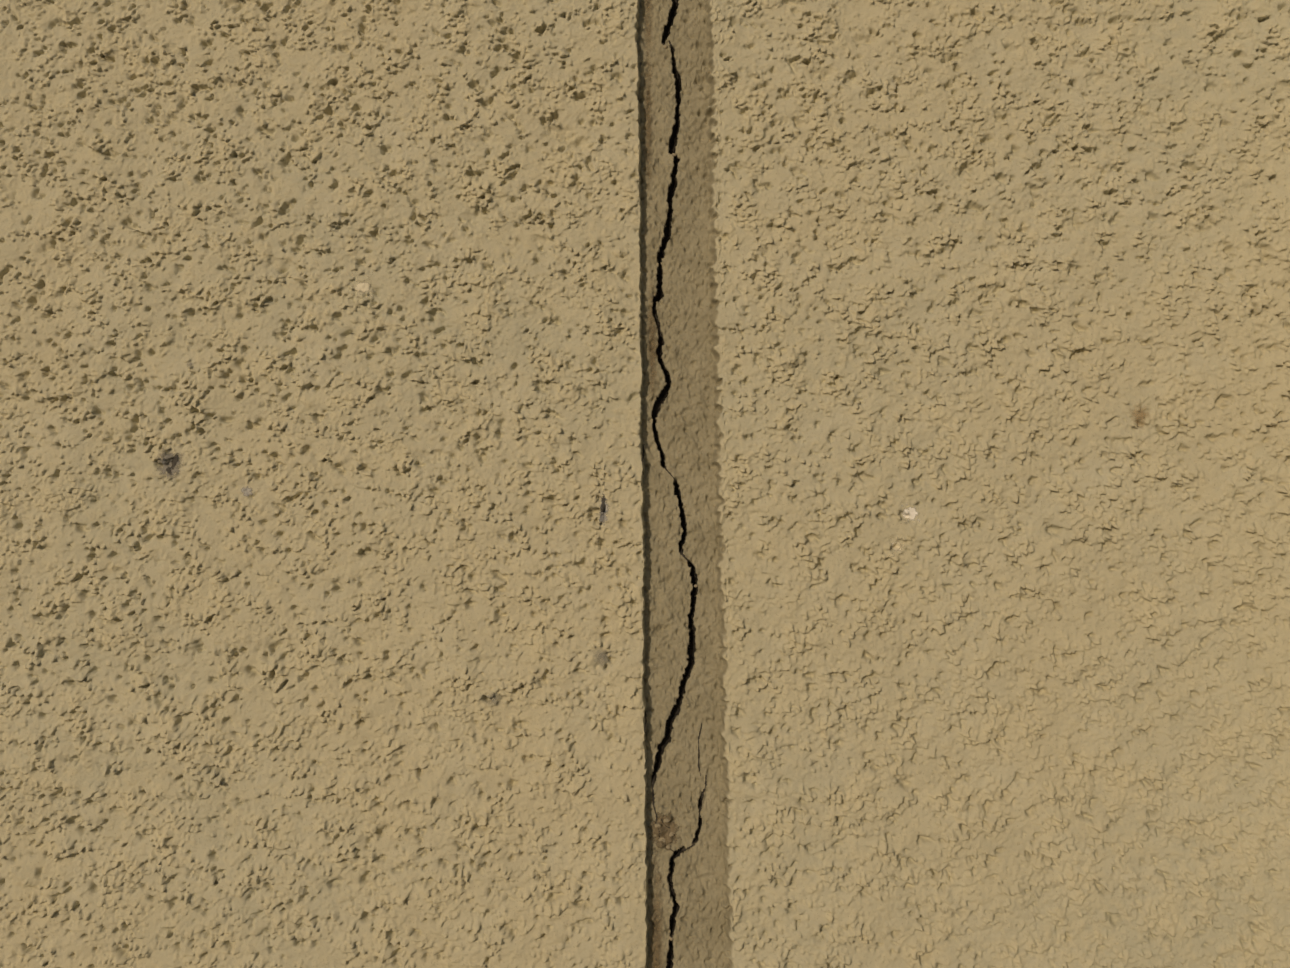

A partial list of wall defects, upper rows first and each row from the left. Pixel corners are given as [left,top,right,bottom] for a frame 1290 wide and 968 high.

crack [641,0,707,968]